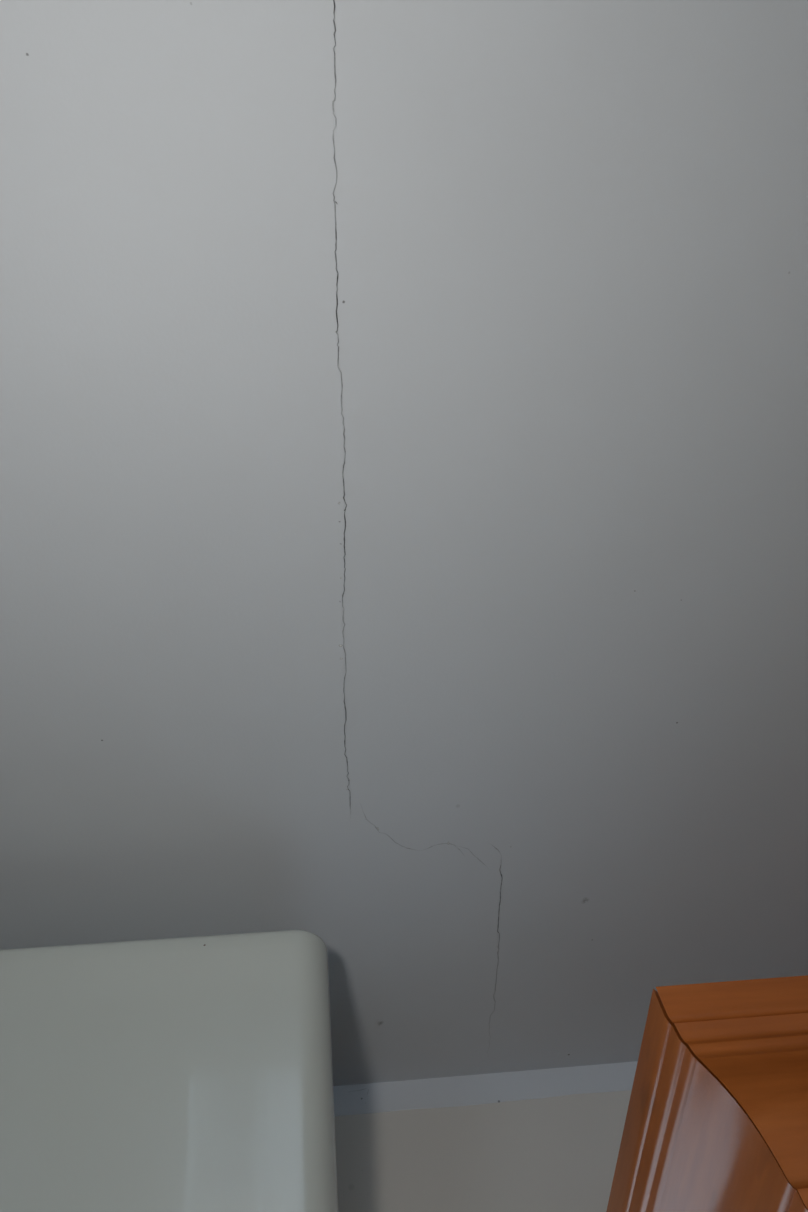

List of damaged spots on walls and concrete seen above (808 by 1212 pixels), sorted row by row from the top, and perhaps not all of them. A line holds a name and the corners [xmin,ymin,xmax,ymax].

crack [332,198,340,355]
crack [338,448,347,598]